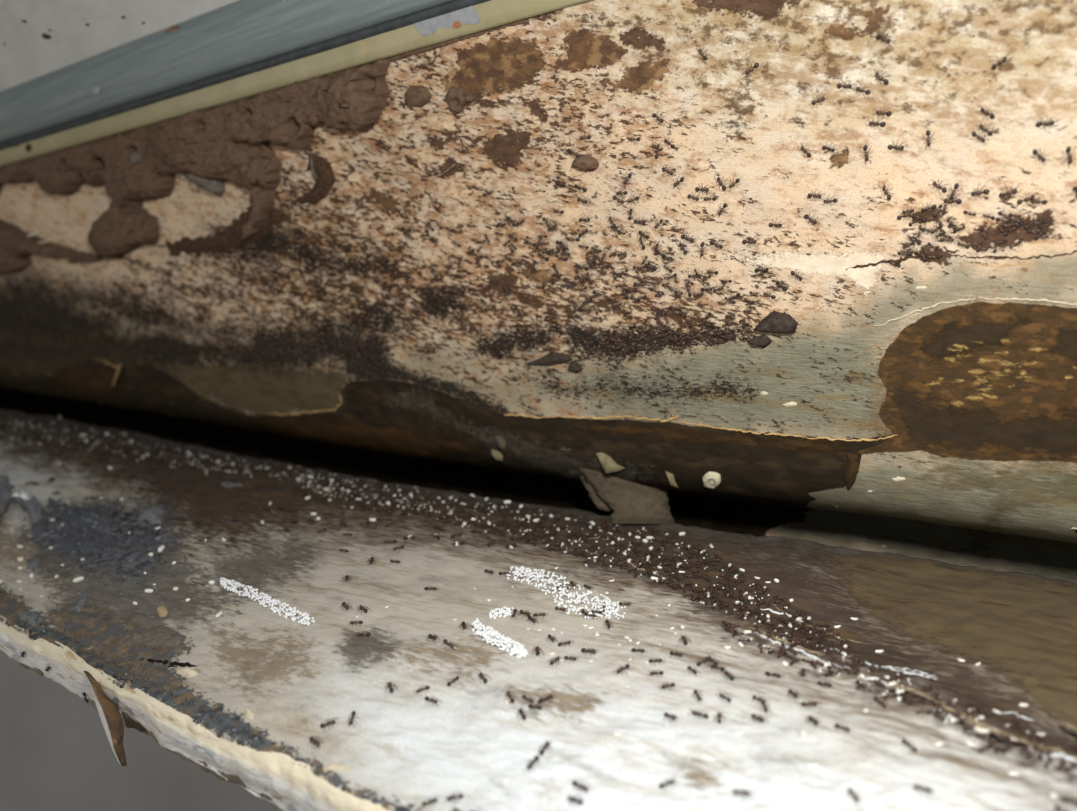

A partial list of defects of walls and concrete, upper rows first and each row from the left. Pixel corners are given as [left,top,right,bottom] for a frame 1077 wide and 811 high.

crack [846,250,1077,270]
leakage [487,269,553,294]
peeling [0,360,1077,811]